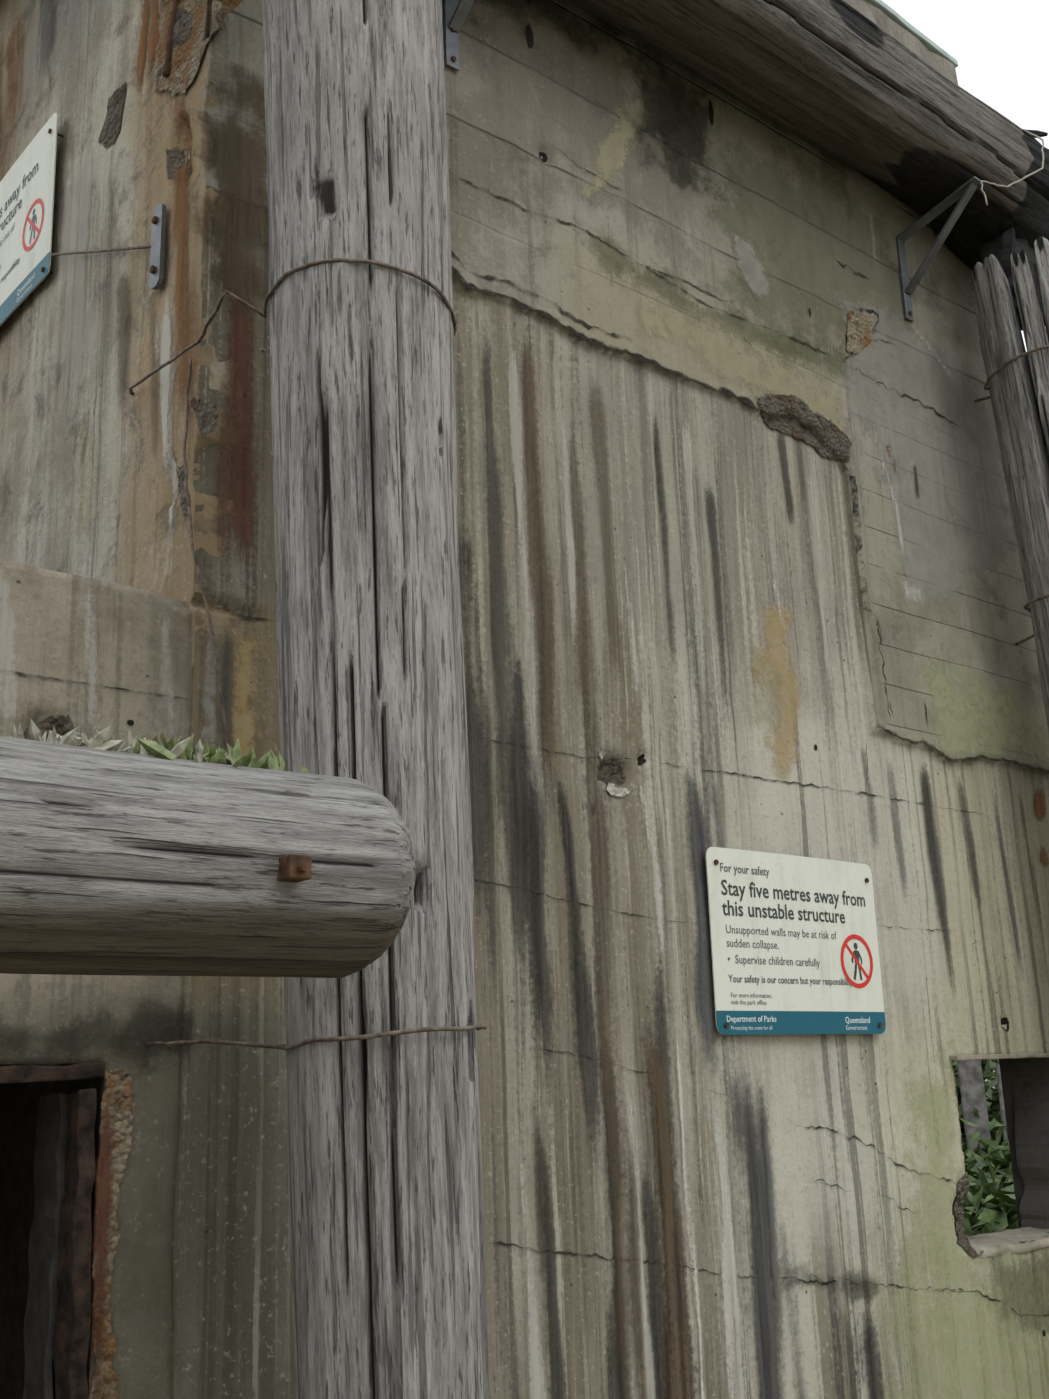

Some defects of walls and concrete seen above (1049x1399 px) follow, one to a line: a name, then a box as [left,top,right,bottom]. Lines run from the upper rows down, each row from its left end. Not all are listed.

spalling [98,82,126,148]
corrosion [137,0,160,86]
corrosion [173,93,199,407]
spalling [153,0,242,96]
corrosion [218,302,258,560]
crack [461,178,961,427]
crack [451,250,1049,815]
damp [458,339,705,1399]
damp [687,776,717,1058]
spalling [88,1068,135,1399]
damp [713,1079,784,1399]
crack [488,1241,1049,1317]